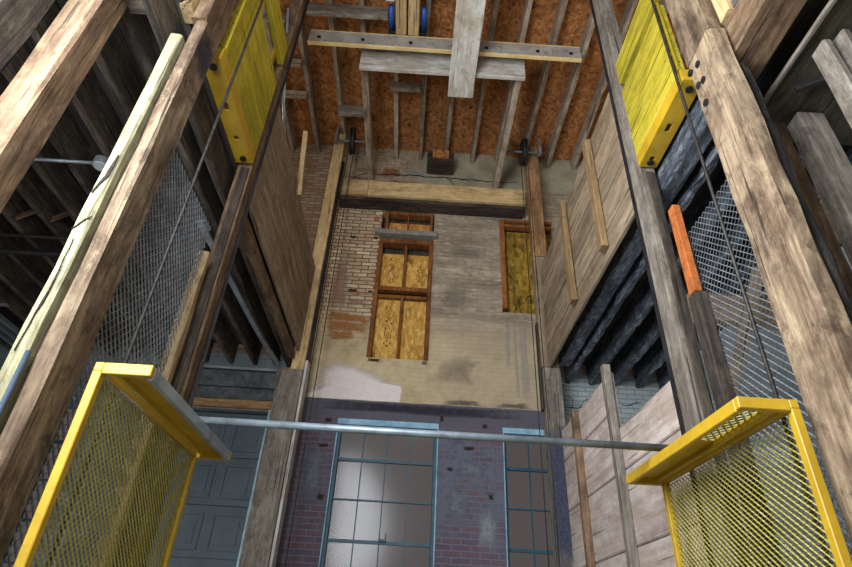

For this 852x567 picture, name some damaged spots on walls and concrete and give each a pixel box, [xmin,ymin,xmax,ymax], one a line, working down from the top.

crack [91,154,119,193]
crack [14,216,92,351]